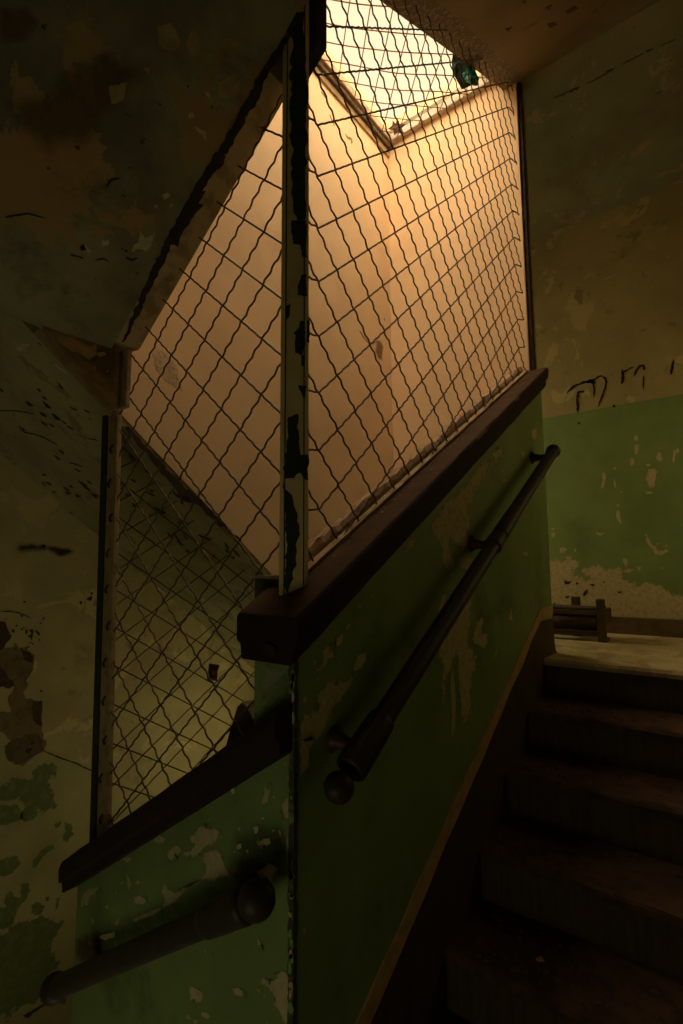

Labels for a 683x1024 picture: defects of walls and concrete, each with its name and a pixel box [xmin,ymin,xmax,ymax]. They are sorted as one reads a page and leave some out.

peeling [630,435,679,494]
peeling [550,528,683,620]
spalling [0,601,47,767]
peeling [284,651,367,780]
peeling [438,598,488,737]
peeling [121,783,289,922]